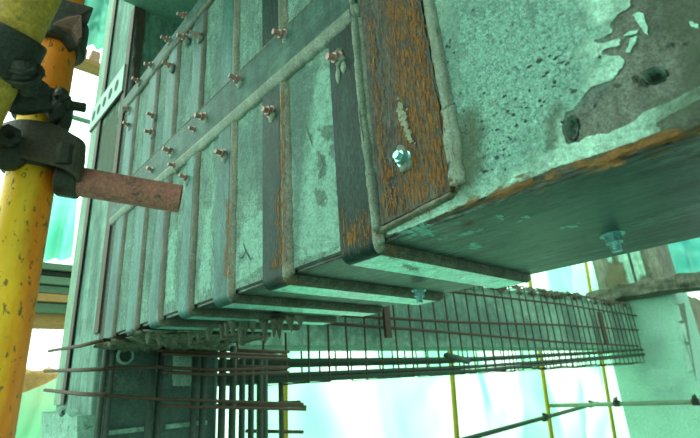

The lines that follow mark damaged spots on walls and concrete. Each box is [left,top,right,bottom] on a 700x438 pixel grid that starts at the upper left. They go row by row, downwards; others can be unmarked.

corrosion [267,93,308,287]
corrosion [338,207,380,256]
corrosion [367,0,700,225]
peeling [387,0,689,235]